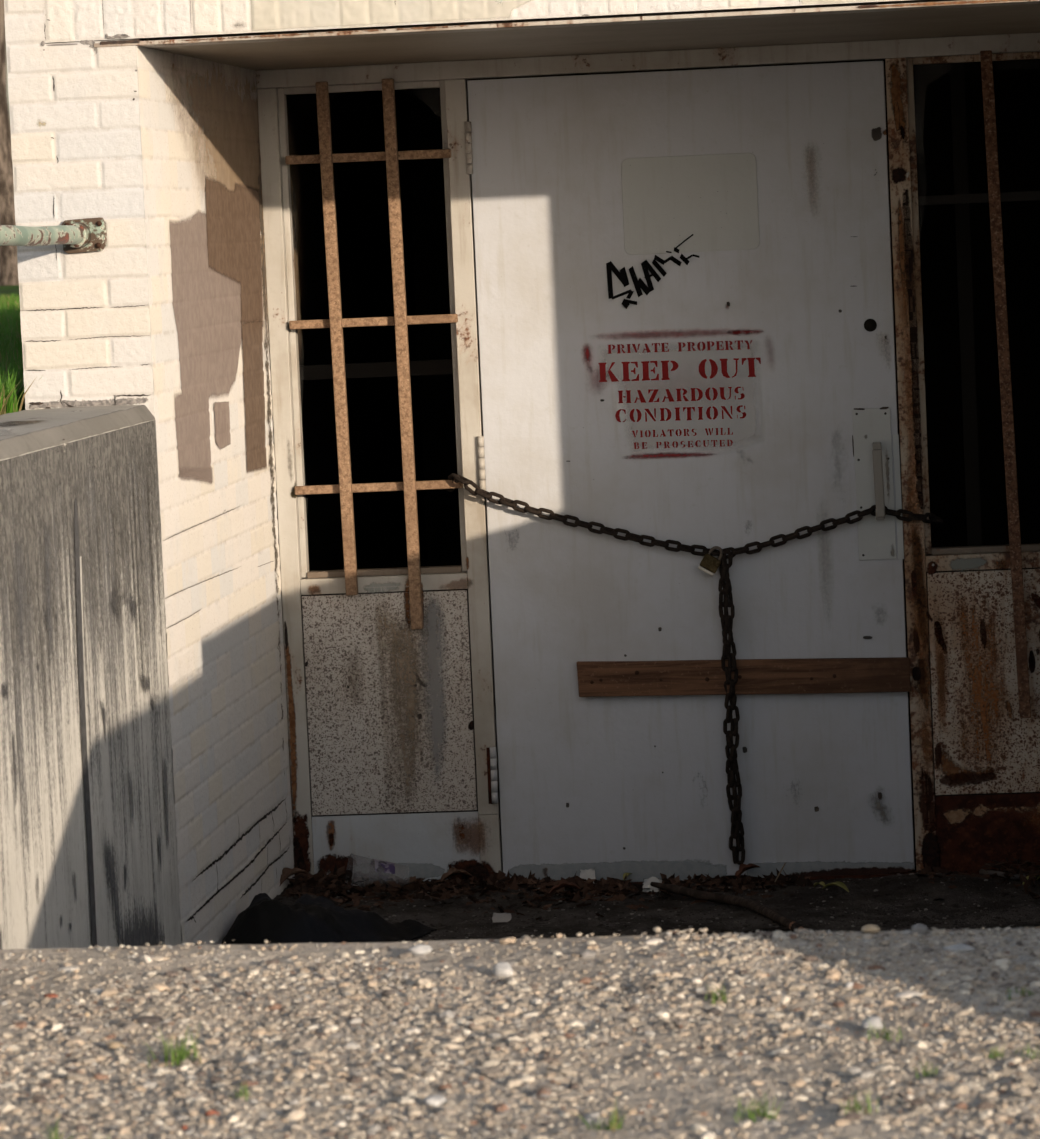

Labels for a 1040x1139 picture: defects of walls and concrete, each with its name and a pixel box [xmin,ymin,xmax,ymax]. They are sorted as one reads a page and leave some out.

damp [0,420,169,870]
damp [105,836,165,947]
corrosion [284,622,357,875]
corrosion [404,579,424,626]
corrosion [447,819,495,882]
corrosion [786,189,1040,877]